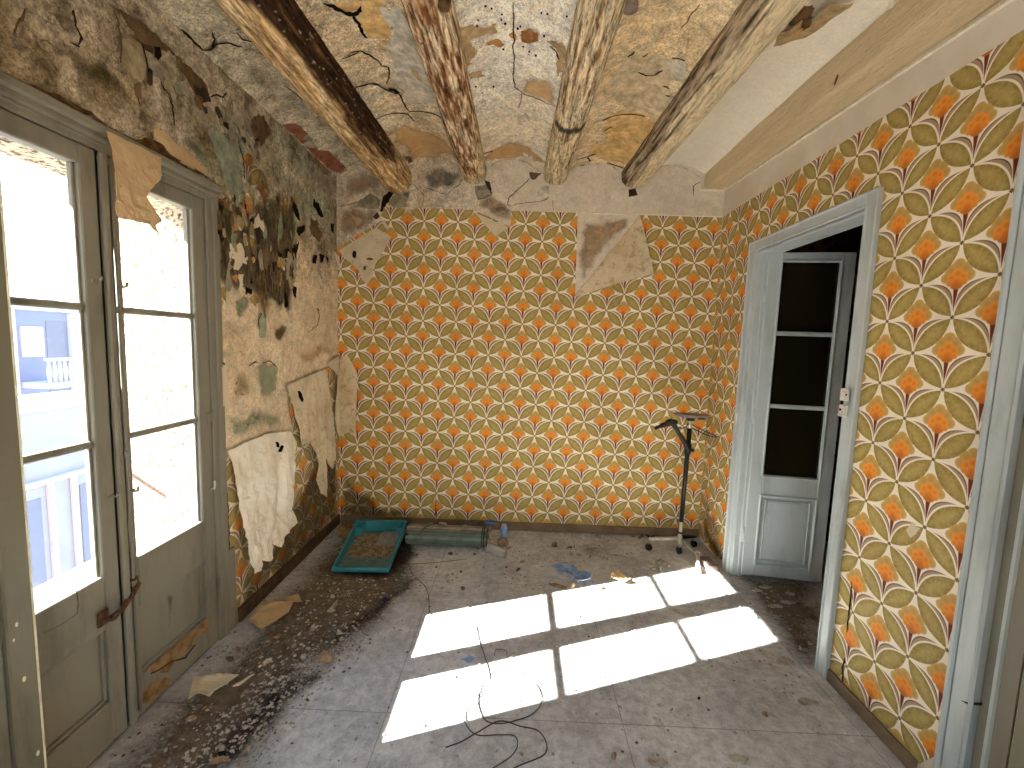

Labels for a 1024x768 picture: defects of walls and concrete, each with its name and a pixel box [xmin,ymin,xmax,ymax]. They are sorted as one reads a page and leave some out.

peeling [107,2,280,196]
crack [180,29,251,51]
flaking render [280,122,347,174]
crack [323,3,441,122]
crack [512,7,550,106]
peeling [774,3,854,47]